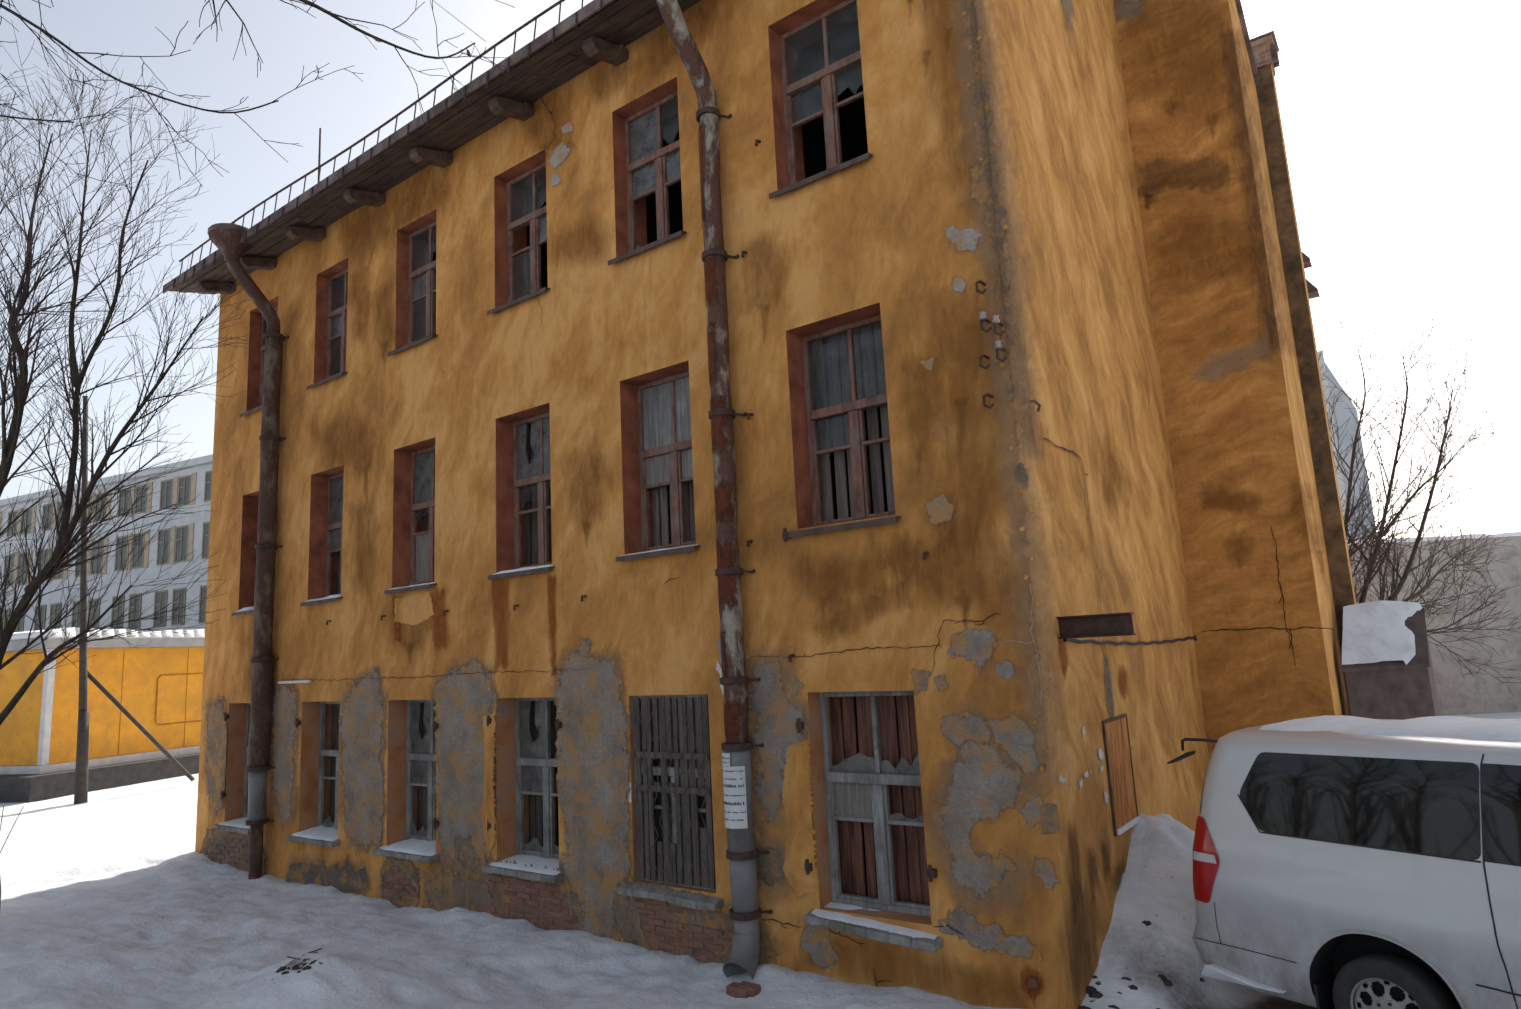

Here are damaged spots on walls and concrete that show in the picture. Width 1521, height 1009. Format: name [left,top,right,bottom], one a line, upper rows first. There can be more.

corrosion [698,124,706,228]
water stain [1115,0,1285,378]
corrosion [704,255,718,304]
corrosion [707,322,729,454]
peeling [921,493,955,525]
peeling [932,0,1105,960]
crack [1201,527,1334,666]
peeling [909,668,948,695]
peeling [200,636,734,963]
peeling [746,649,809,897]
spalling [726,923,780,998]
peeling [800,924,839,972]